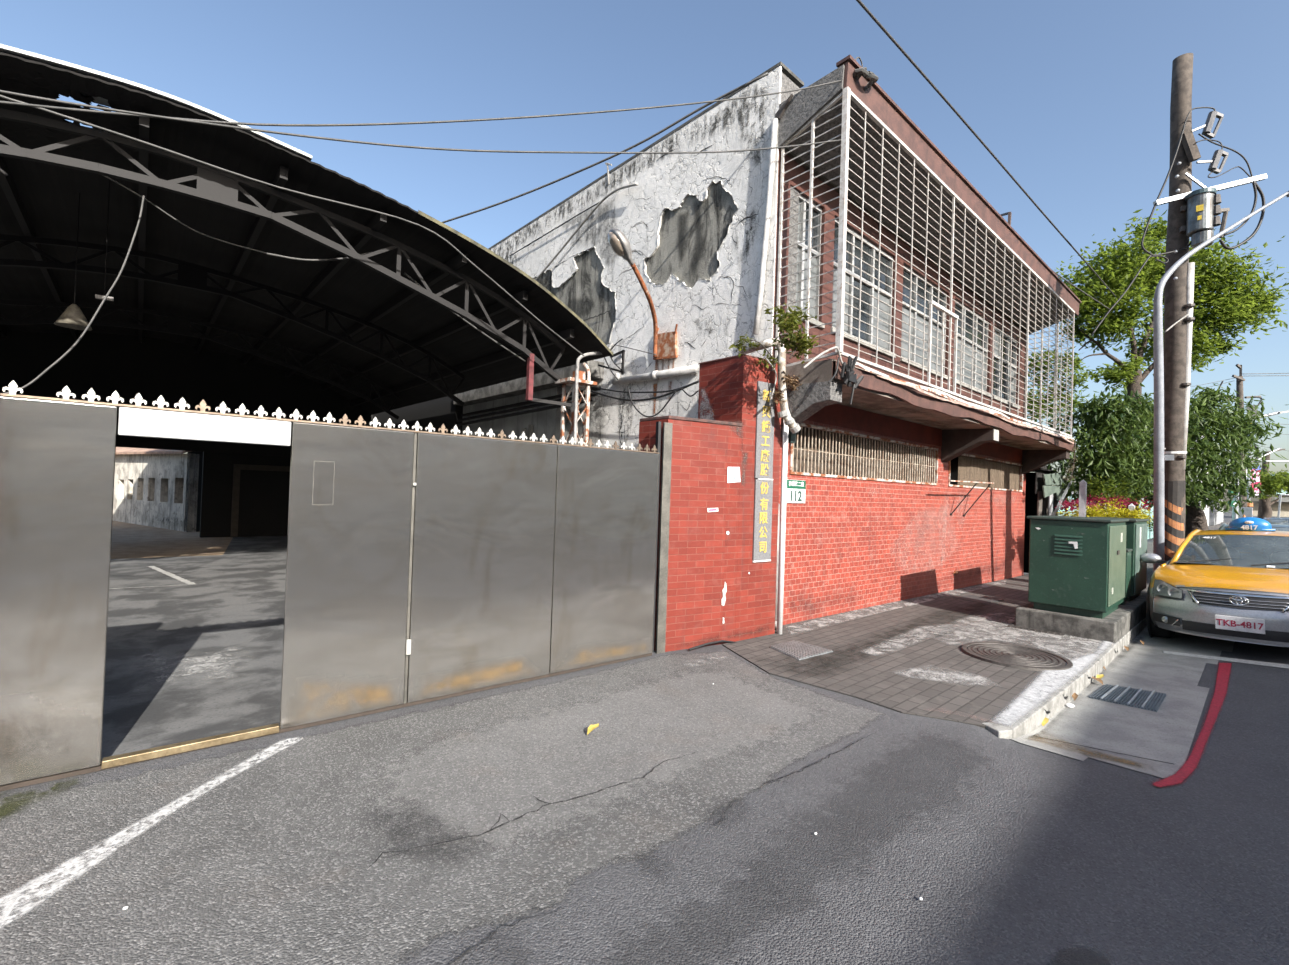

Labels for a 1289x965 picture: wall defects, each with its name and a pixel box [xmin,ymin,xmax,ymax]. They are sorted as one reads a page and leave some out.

water stain [691,88,765,162]
spalling [533,246,617,345]
water stain [494,138,677,265]
crack [583,197,651,337]
spalling [643,179,740,288]
crack [684,276,749,349]
crack [699,176,758,246]
water stain [736,212,755,258]